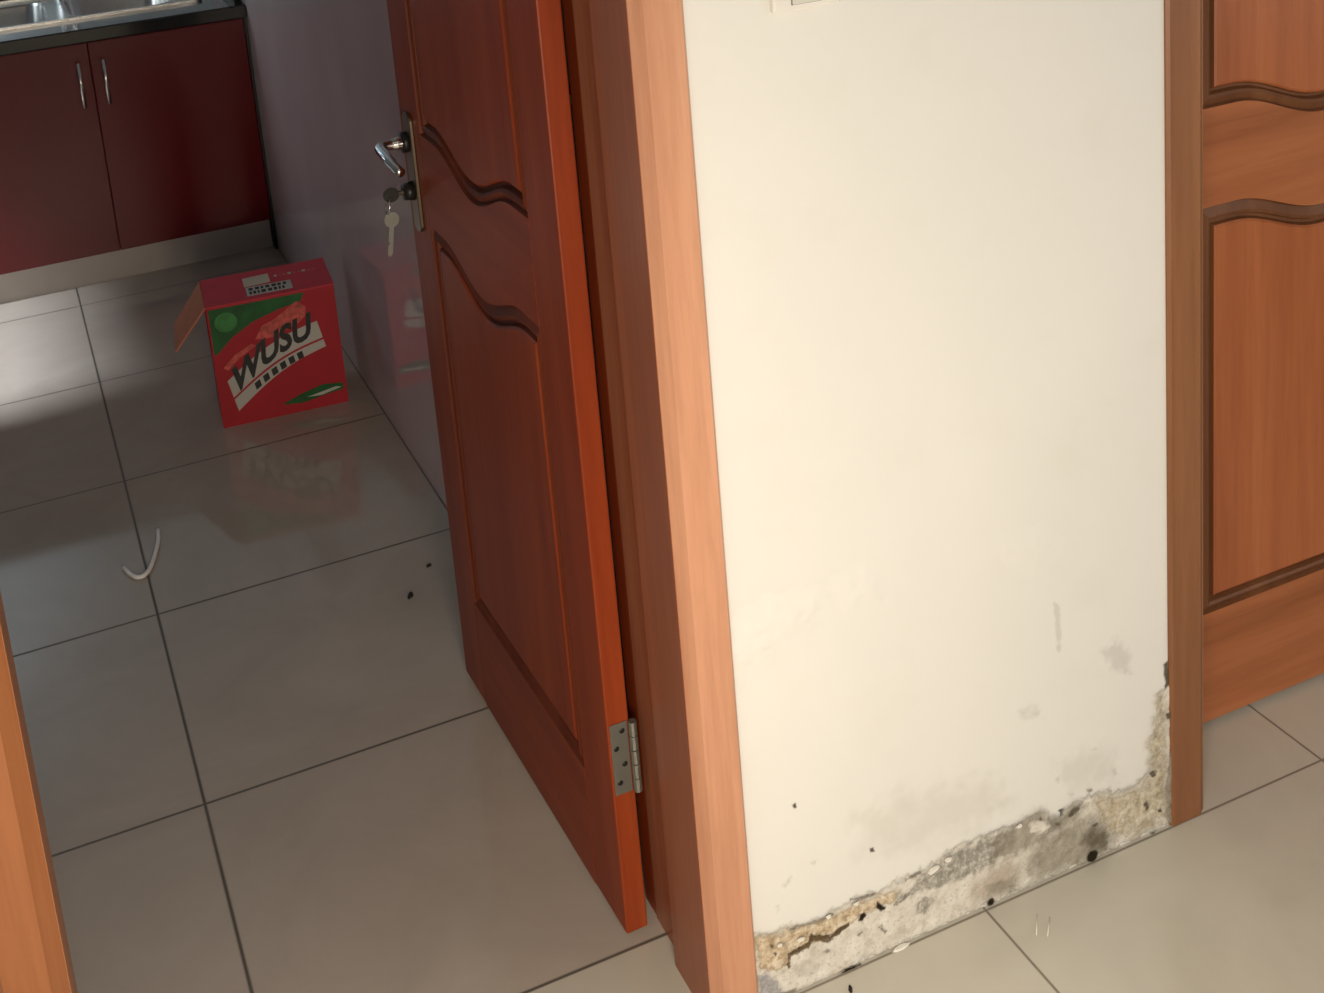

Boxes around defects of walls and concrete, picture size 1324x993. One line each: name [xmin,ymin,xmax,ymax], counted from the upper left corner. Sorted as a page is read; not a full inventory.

flaking render [754,685,1170,993]